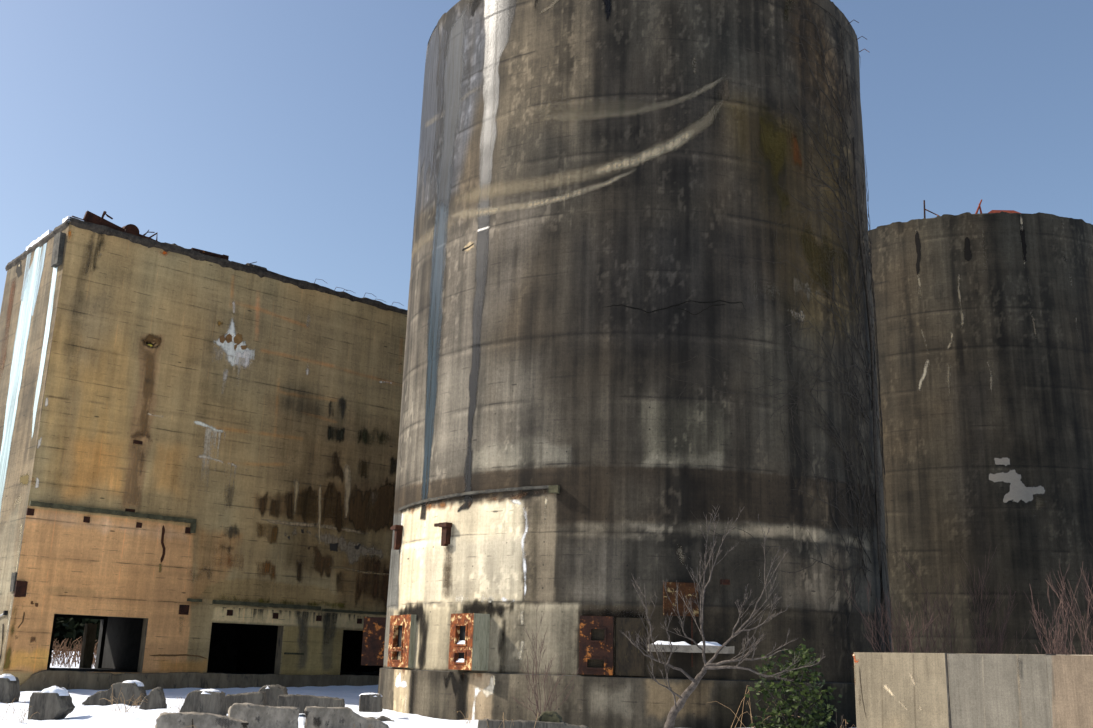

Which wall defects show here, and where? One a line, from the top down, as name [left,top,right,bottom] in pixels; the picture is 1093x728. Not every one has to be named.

water stain [519,191,581,207]
water stain [412,0,516,520]
crack [914,231,922,286]
crack [1019,218,1027,262]
crack [919,237,972,392]
rust [130,352,154,504]
peeling [989,458,1045,503]
crack [158,525,166,572]